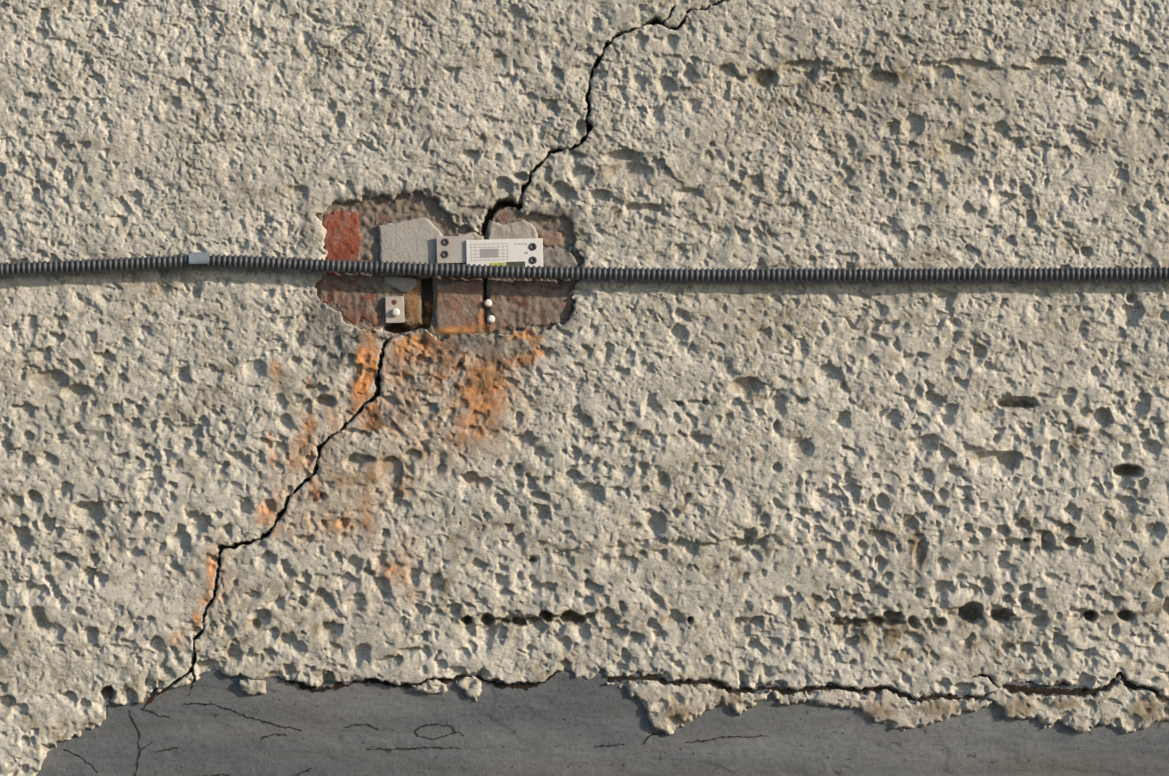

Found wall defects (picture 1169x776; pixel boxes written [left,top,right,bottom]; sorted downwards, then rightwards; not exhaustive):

crack [482,0,729,235]
spalling [315,191,584,342]
corrosion [353,330,379,428]
corrosion [397,300,484,392]
corrosion [467,365,503,437]
corrosion [505,327,543,365]
crack [129,329,407,776]
peeling [239,678,266,696]
peeling [411,676,482,702]
peeling [606,675,1169,735]
crack [608,672,1169,703]